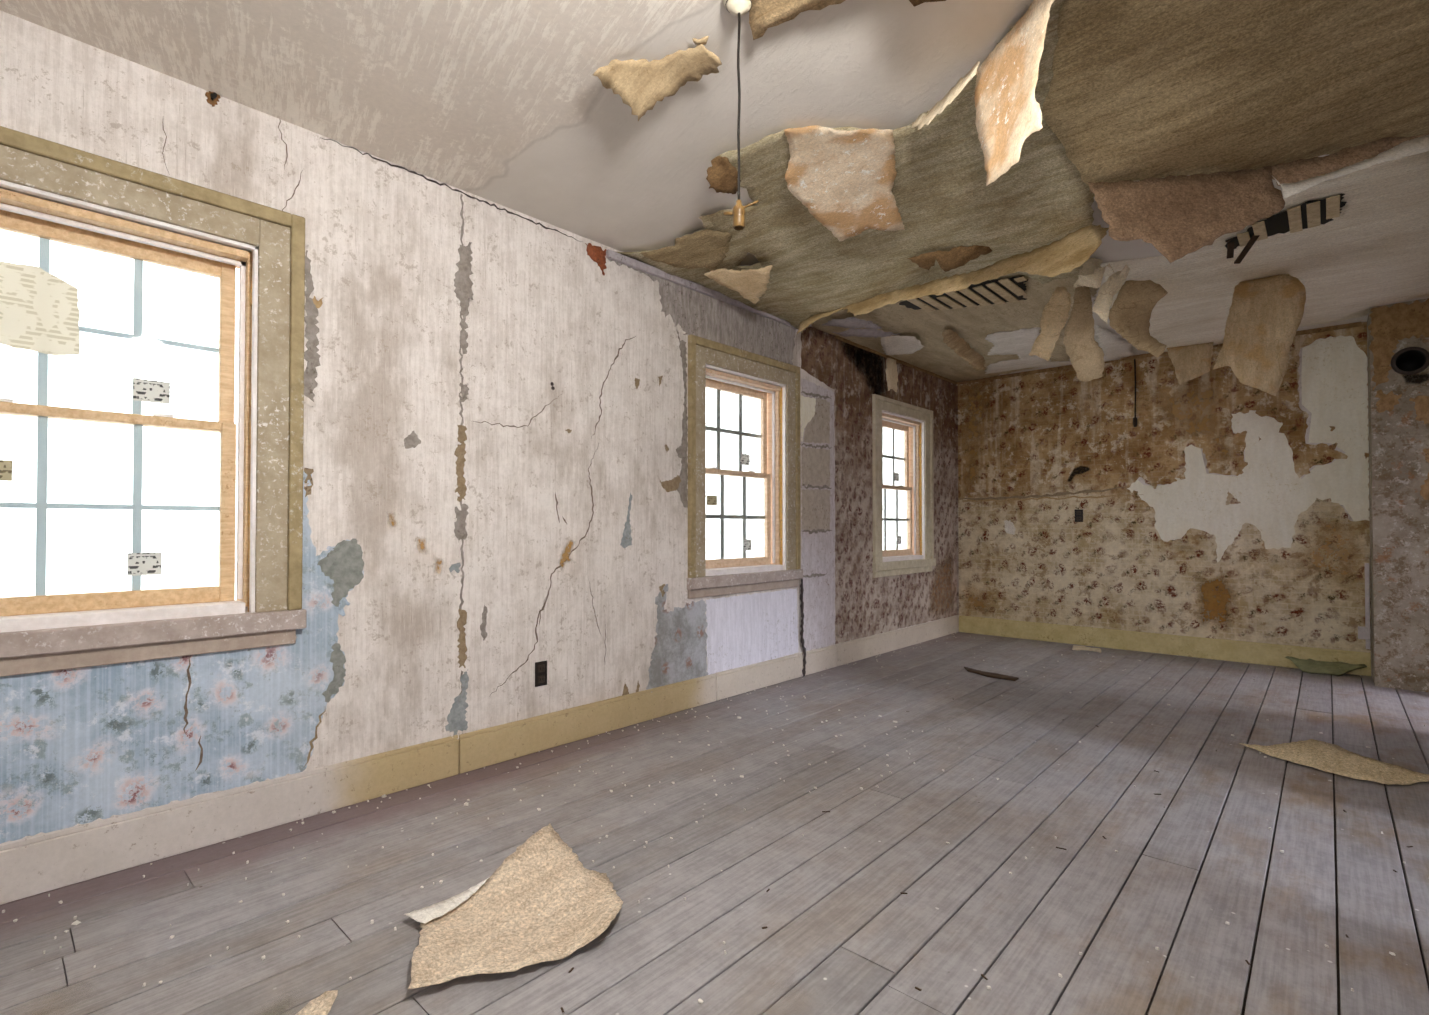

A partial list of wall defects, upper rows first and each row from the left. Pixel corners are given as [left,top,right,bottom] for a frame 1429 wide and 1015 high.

spalling [449,425,469,577]
spalling [454,240,474,357]
spalling [459,382,469,402]
crack [459,301,559,428]
crack [459,336,636,696]
flaking render [585,243,836,652]
flaking render [984,327,1071,374]
flaking render [1094,325,1134,362]
peeling [1127,335,1369,563]
crack [183,655,203,771]
spalling [445,605,488,739]
crack [799,579,807,676]